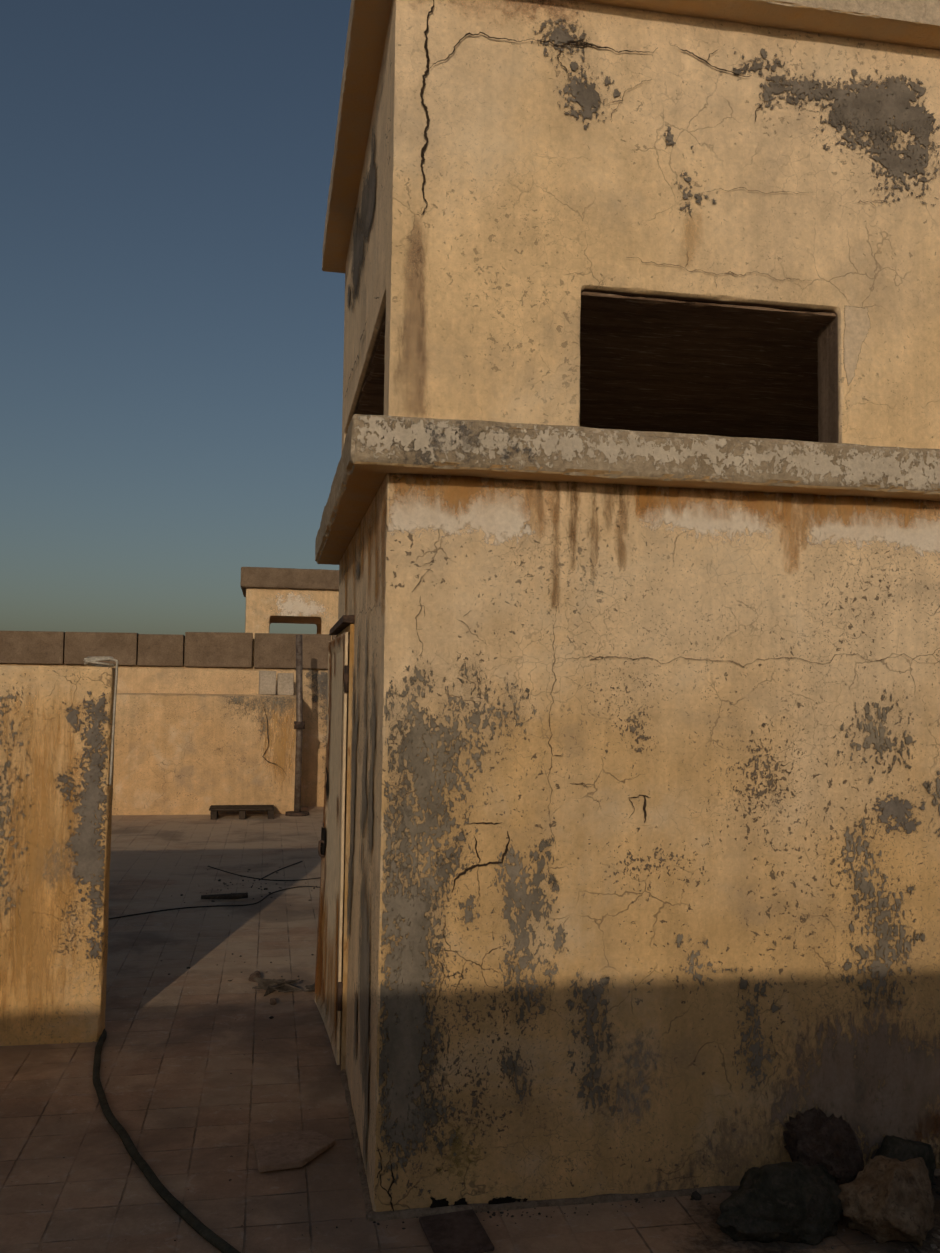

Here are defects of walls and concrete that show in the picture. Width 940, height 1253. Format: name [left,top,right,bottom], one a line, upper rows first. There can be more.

peeling [347,128,377,320]
peeling [531,12,621,129]
crack [420,0,763,215]
peeling [733,48,940,207]
peeling [354,415,940,493]
water stain [609,486,940,556]
peeling [44,691,110,968]
rust [323,633,344,828]
peeling [347,617,620,1208]
peeling [720,720,812,833]
peeling [833,684,940,1014]
water stain [770,996,940,1253]